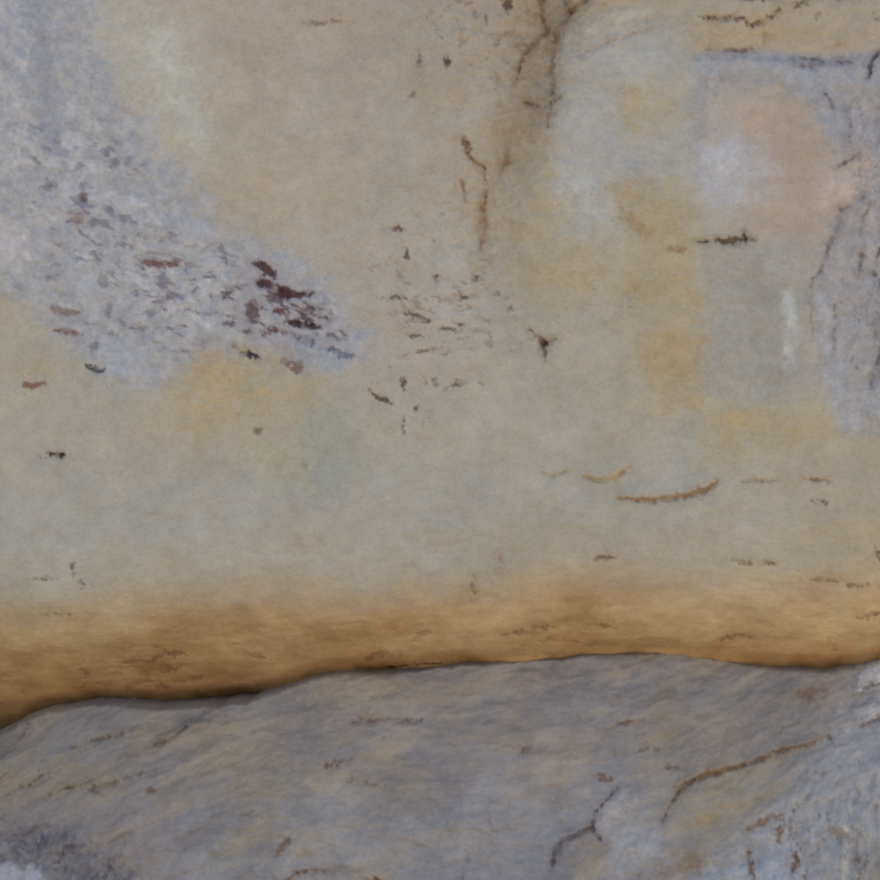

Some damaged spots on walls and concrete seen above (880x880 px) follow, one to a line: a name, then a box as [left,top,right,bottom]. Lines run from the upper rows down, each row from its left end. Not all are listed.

spalling [668,0,880,62]
crack [450,131,516,254]
crack [537,460,835,510]
crack [657,674,880,828]